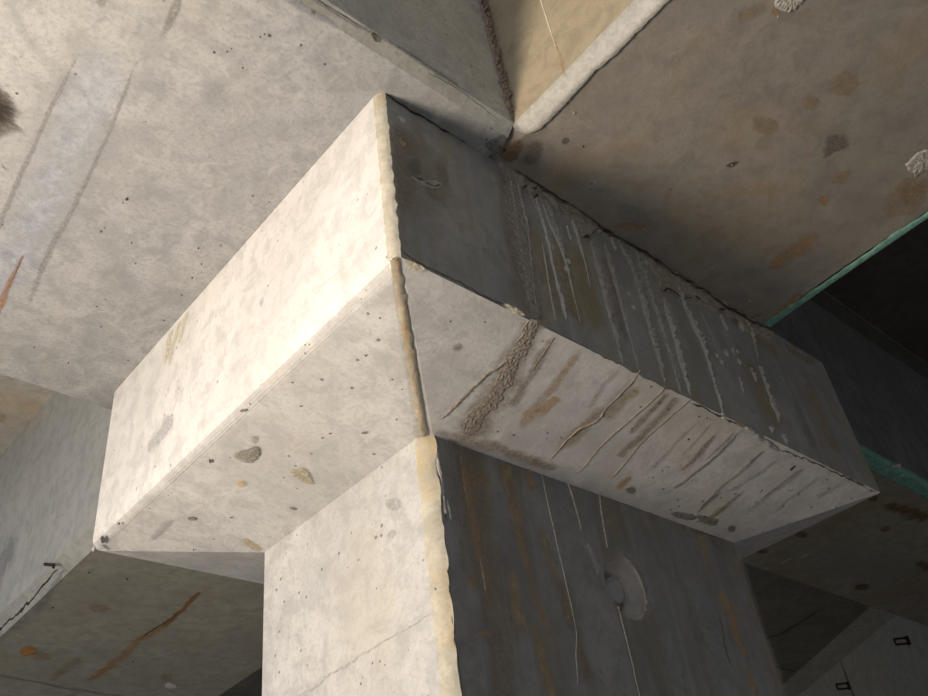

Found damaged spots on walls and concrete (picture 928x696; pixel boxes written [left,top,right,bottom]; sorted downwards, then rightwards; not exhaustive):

spalling [773,0,804,18]
crack [315,0,498,120]
spalling [902,149,928,193]
corrosion [0,256,23,309]
crack [0,564,62,631]
corrosion [92,592,200,678]
crack [298,612,432,696]